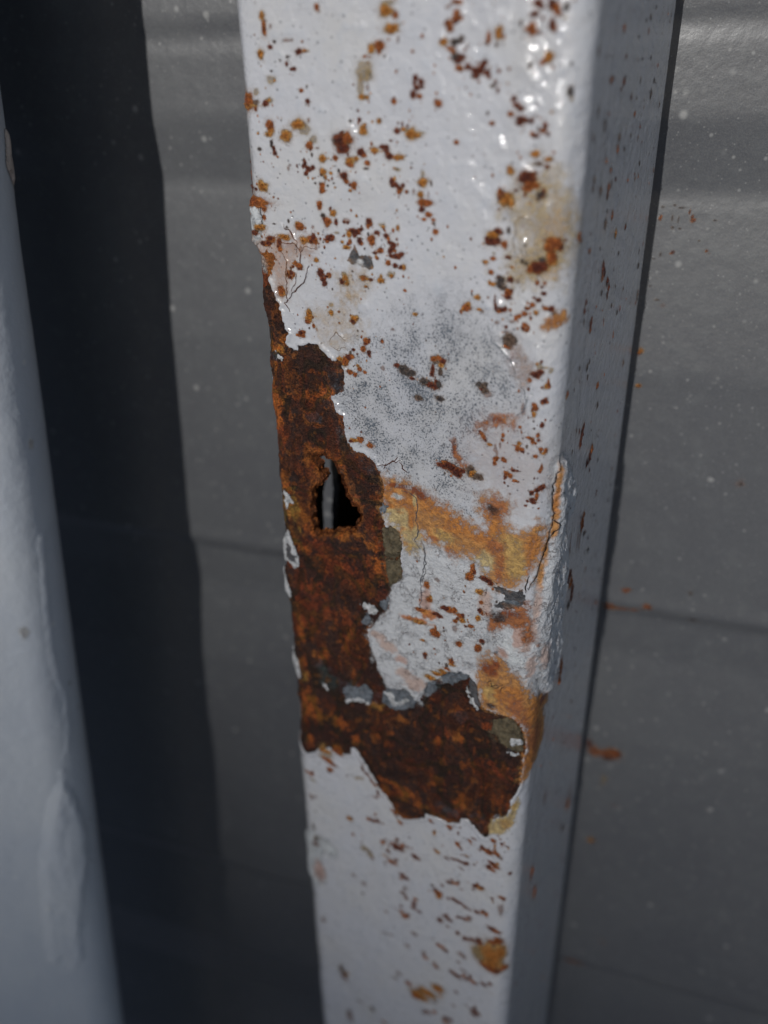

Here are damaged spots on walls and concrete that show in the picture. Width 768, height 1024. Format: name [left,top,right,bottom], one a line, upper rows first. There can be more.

crack [260,207,315,311]
peeling [338,303,529,514]
rust [244,0,639,1024]
spalling [479,576,526,610]
crack [524,463,561,593]